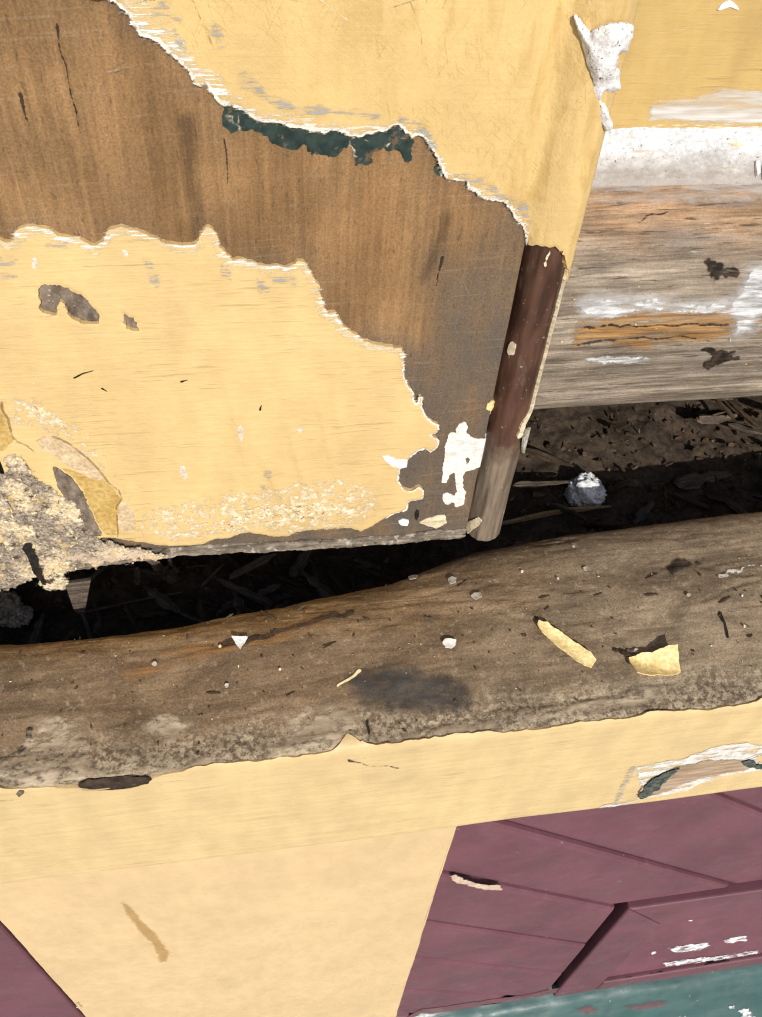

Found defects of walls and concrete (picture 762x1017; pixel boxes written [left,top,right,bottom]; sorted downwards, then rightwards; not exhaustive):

peeling [0,0,530,544]
peeling [516,269,568,453]
spalling [0,402,190,591]
peeling [442,638,456,649]